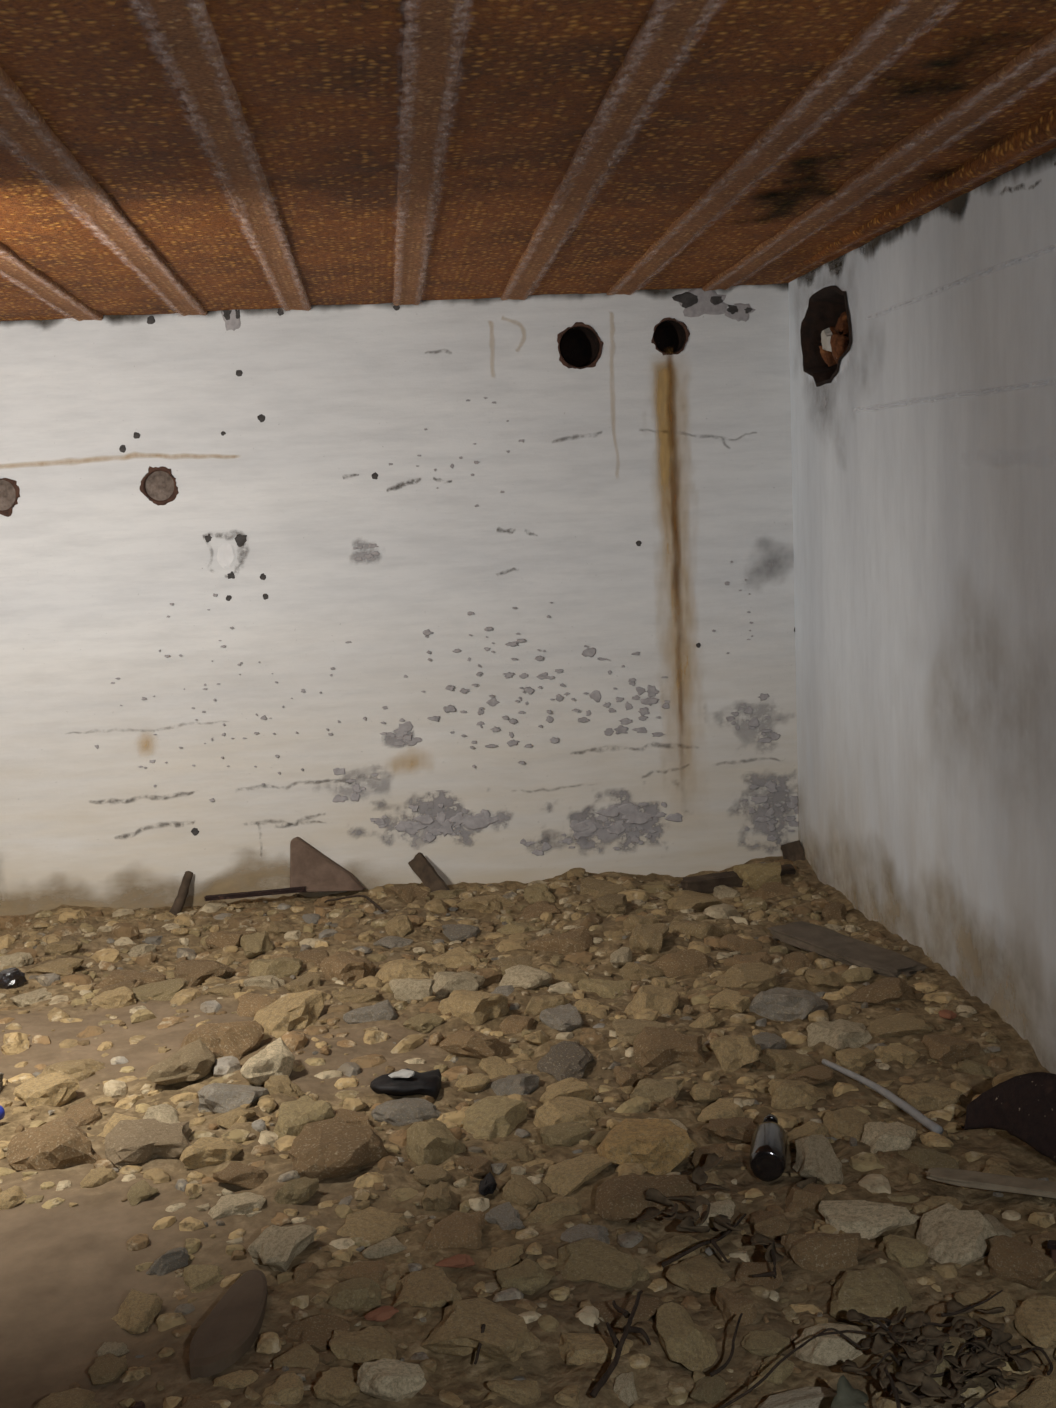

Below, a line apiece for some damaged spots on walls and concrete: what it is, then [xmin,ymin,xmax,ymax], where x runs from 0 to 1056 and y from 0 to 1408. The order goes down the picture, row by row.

corrosion [657,360,680,614]
peeling [726,693,781,743]
peeling [333,768,378,803]
peeling [352,790,511,846]
peeling [520,790,683,856]
peeling [737,774,799,850]